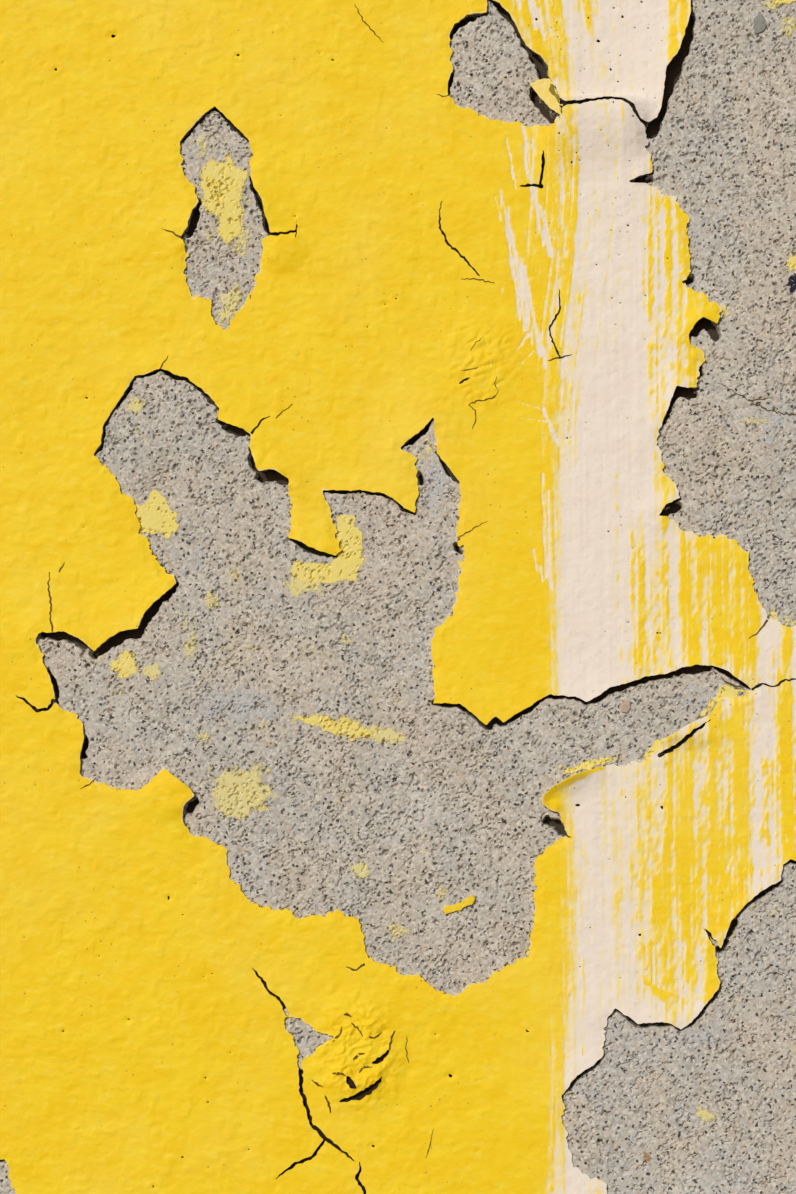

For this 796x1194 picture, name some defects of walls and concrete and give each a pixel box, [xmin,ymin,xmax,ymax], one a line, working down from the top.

peeling [435,0,563,134]
peeling [167,94,283,330]
peeling [615,0,796,627]
peeling [26,357,765,996]
peeling [0,1147,17,1194]
crack [252,968,287,1011]
crack [276,1056,366,1194]
peeling [549,847,796,1194]